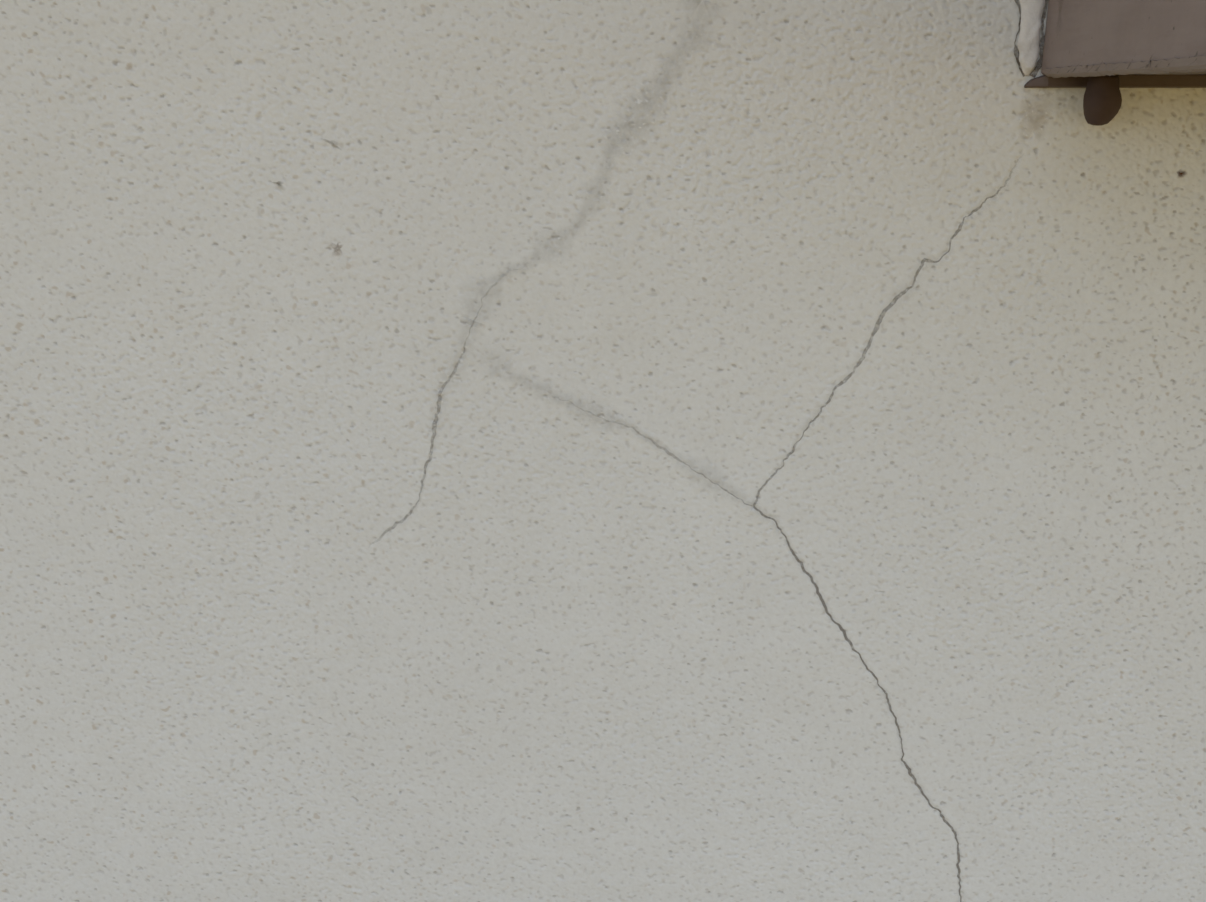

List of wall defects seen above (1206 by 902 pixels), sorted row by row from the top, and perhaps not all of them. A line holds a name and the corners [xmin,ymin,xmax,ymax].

crack [725,197,992,902]